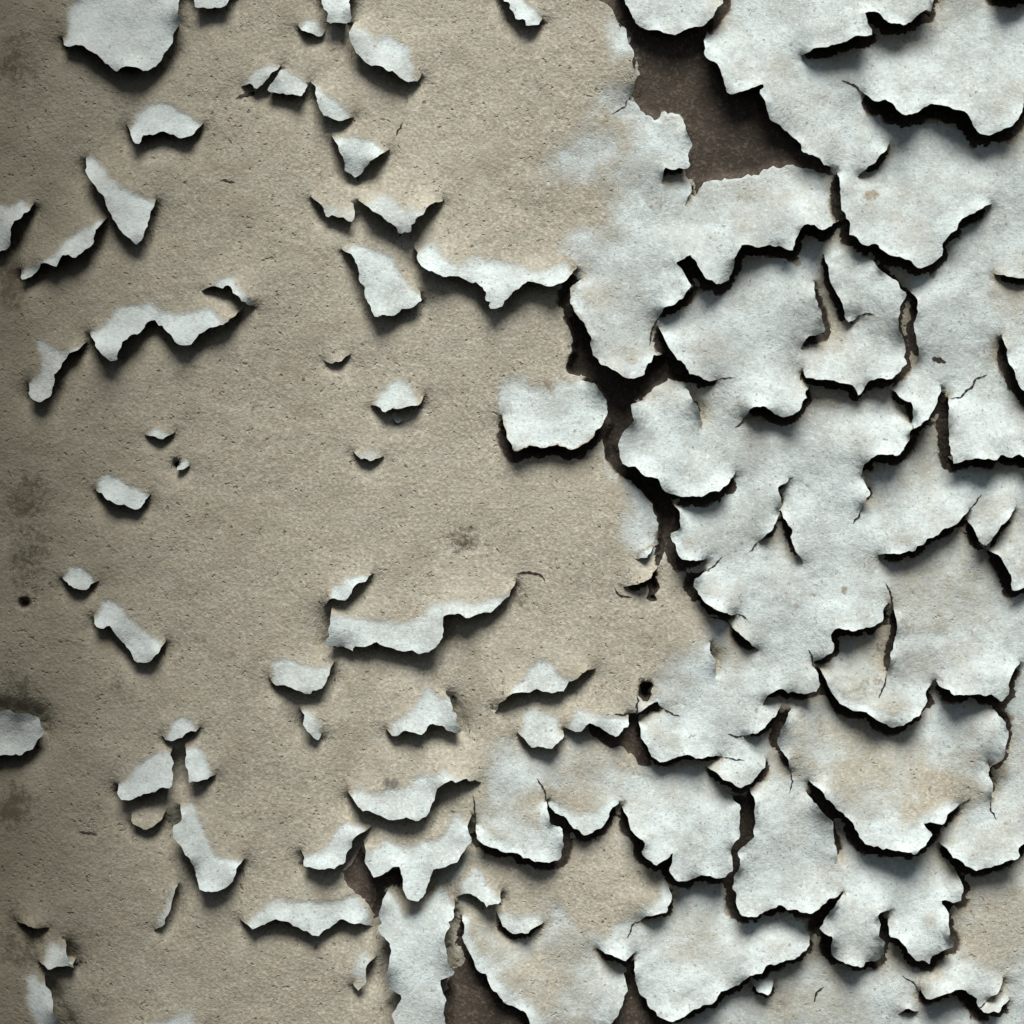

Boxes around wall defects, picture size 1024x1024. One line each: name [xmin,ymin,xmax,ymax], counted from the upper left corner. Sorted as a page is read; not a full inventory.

peeling [60,0,183,72]
peeling [194,0,229,9]
peeling [126,96,203,144]
peeling [0,192,35,251]
peeling [21,148,156,280]
peeling [25,269,256,402]
peeling [240,0,1024,1024]
peeling [93,593,166,663]
peeling [0,710,44,755]
peeling [117,711,216,830]
peeling [173,797,245,892]
peeling [16,915,77,1024]